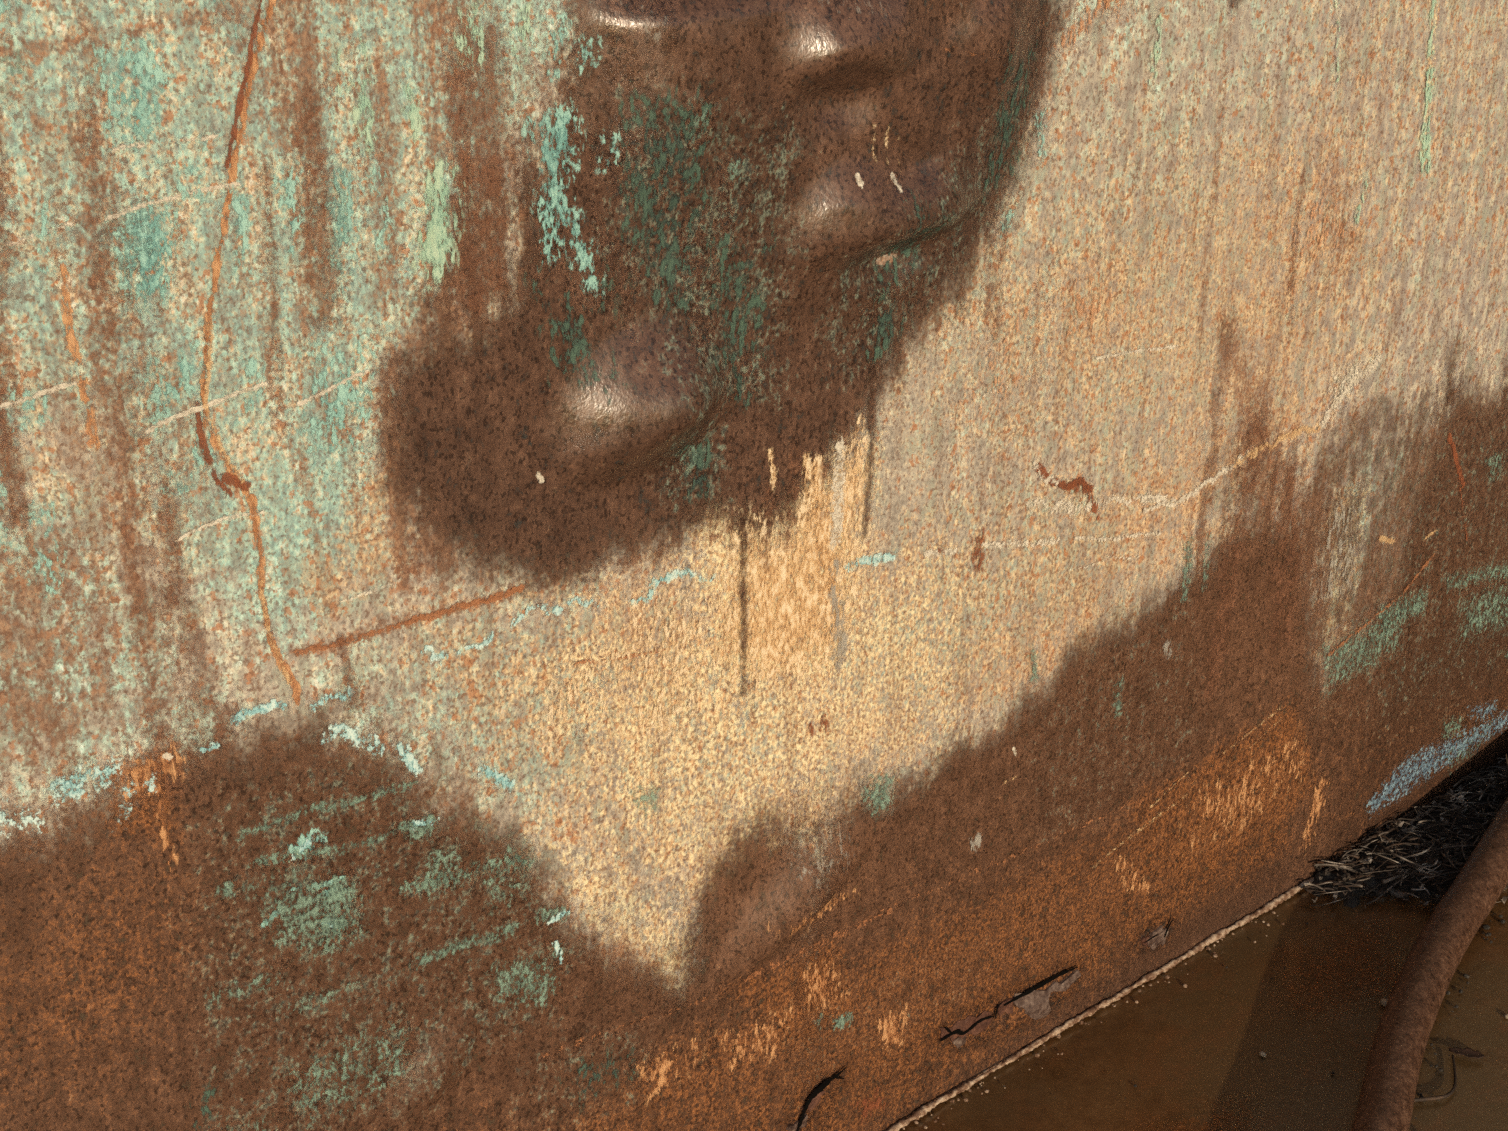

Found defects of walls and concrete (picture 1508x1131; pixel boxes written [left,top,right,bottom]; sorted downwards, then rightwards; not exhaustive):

water stain [384,0,1064,696]
water stain [0,352,1508,1131]
corrosion [1182,739,1330,856]
corrosion [1116,855,1150,893]
crack [784,1065,847,1131]